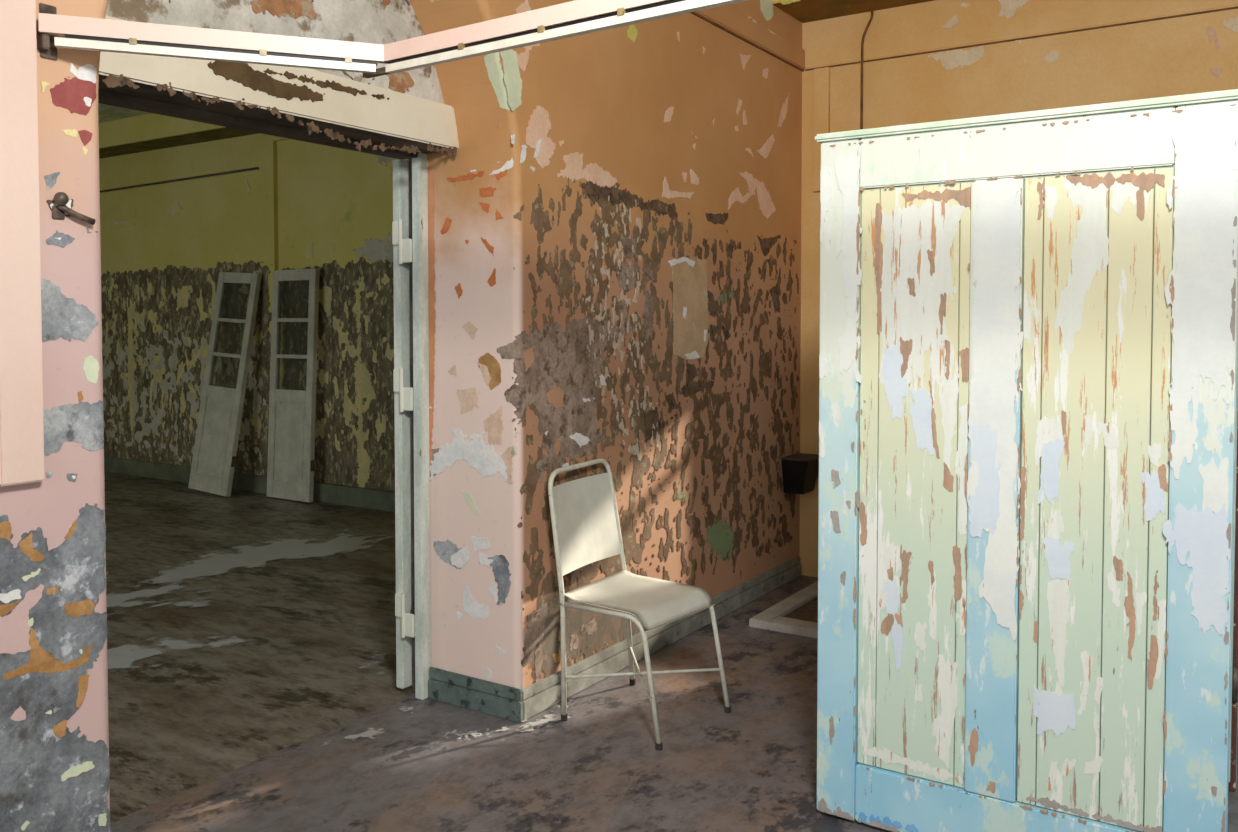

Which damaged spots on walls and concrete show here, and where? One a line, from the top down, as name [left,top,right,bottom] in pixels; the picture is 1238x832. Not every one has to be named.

flaking render [250,0,316,20]
peeling [998,0,1028,19]
peeling [928,45,985,70]
peeling [44,172,74,217]
peeling [46,227,99,248]
peeling [41,232,395,491]
peeling [428,43,799,683]
peeling [831,469,841,488]
peeling [830,491,860,533]
peeling [0,503,111,832]